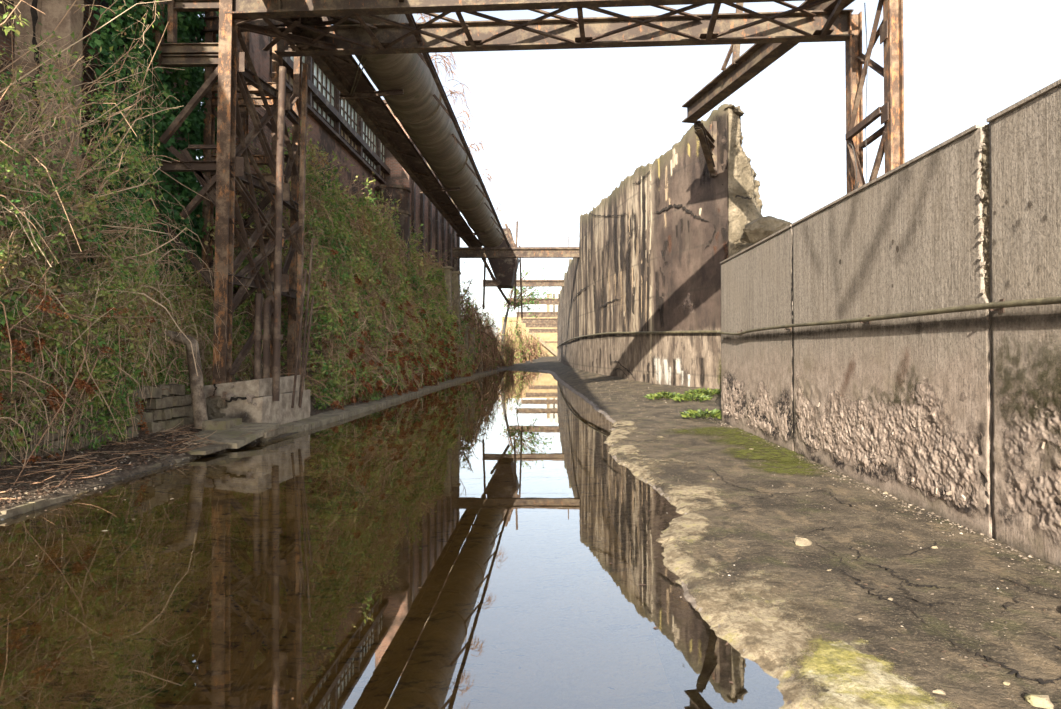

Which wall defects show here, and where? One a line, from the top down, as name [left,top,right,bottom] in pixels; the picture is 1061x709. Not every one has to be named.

leakage [584,141,709,383]
leakage [716,115,728,170]
leakage [604,421,950,709]
leakage [719,365,917,488]
crack [693,439,1061,685]
leakage [933,471,1012,523]